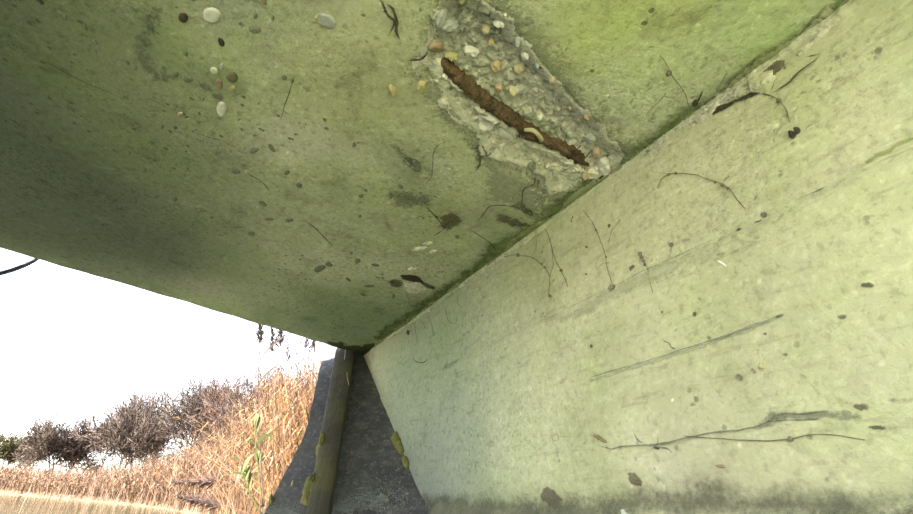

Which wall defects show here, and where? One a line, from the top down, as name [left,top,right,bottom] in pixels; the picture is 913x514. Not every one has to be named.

spalling [404,0,635,202]
damp [422,473,913,514]